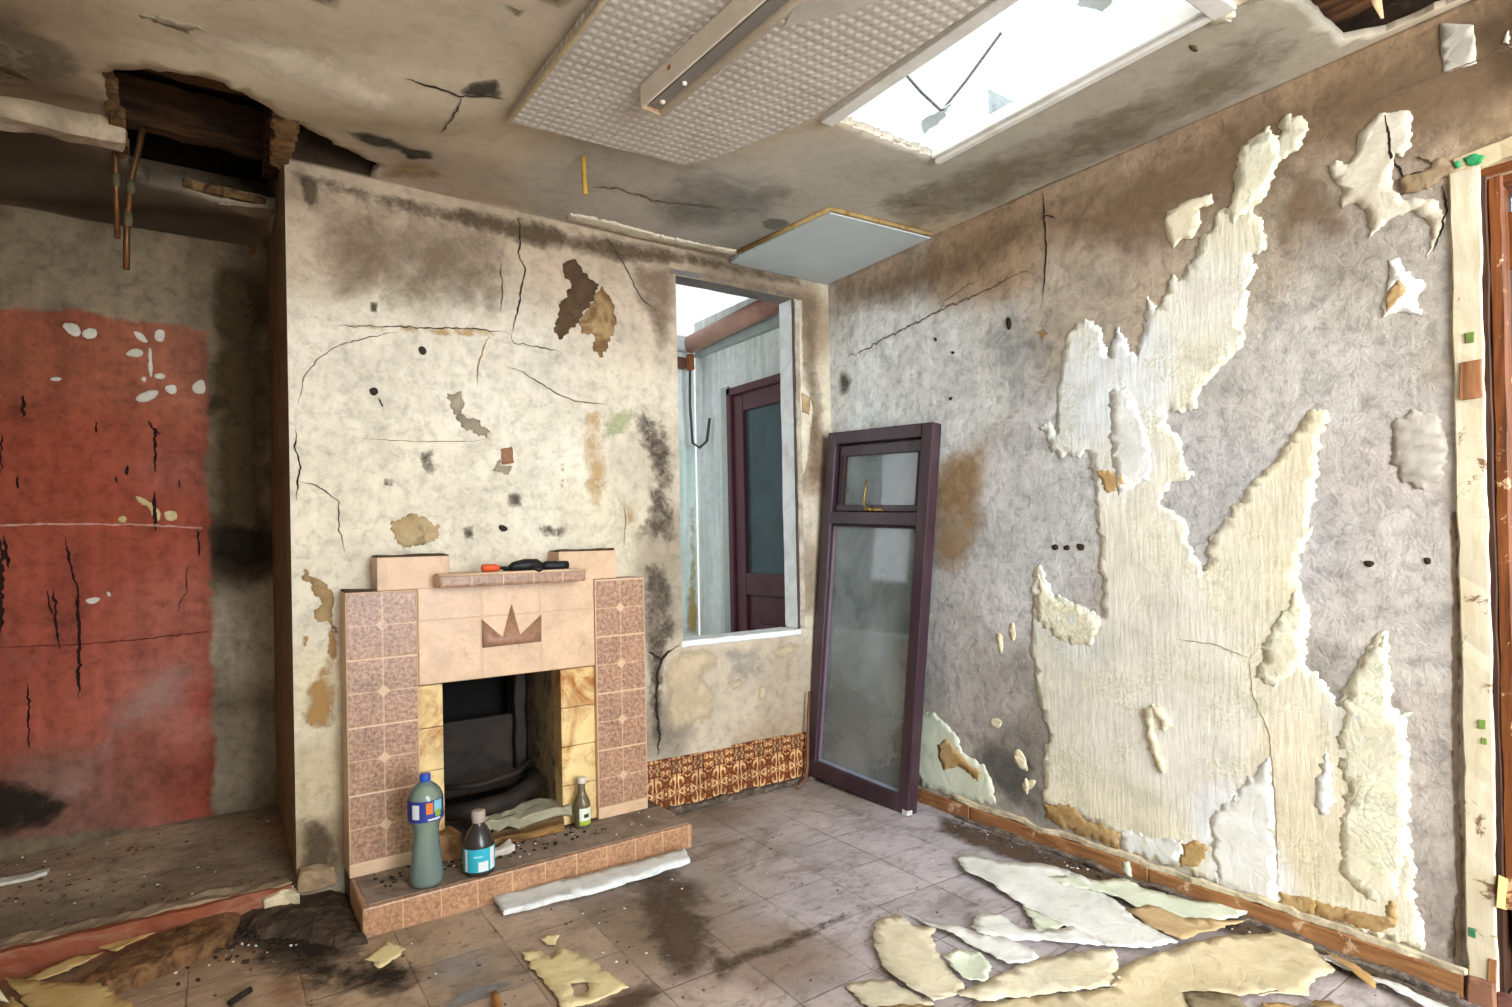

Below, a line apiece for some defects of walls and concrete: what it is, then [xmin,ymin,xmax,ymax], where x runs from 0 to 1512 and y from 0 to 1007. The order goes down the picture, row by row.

leakage [382,197,738,334]
spalling [553,259,618,358]
peeling [1381,258,1426,318]
crack [0,522,202,530]
crack [294,218,606,551]
leakage [640,415,673,540]
leakage [787,278,820,478]
peeling [1097,387,1152,496]
crack [0,566,208,648]
spalling [302,569,338,634]
leakage [646,568,674,738]
peeling [1043,746,1399,932]